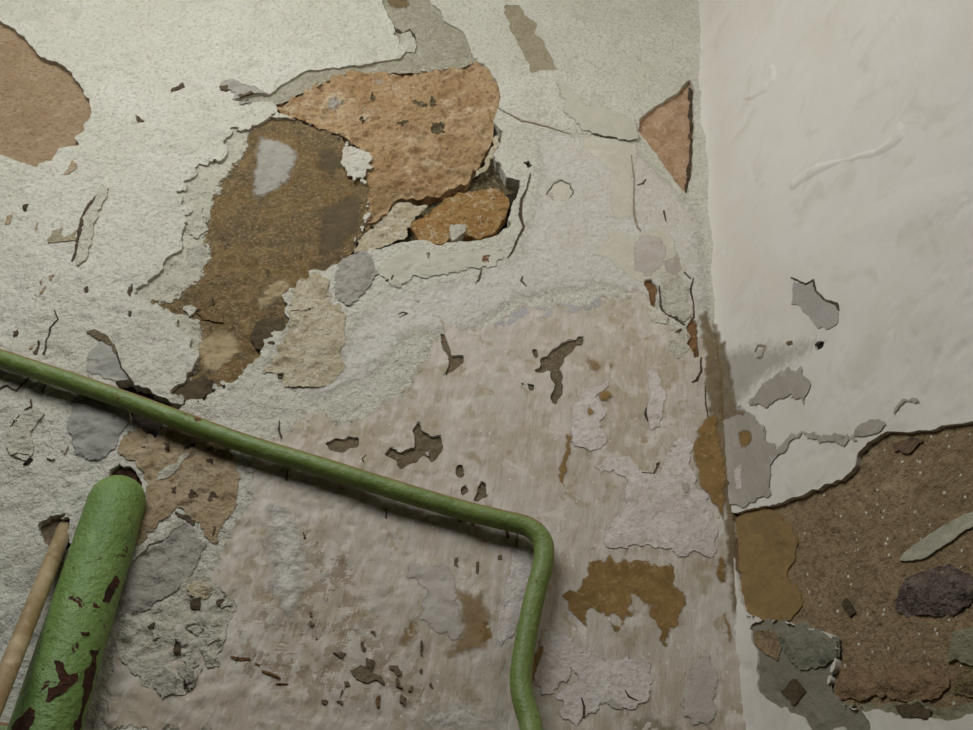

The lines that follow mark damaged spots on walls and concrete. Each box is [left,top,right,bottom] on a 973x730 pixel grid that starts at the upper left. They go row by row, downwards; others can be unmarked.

spalling [0,24,91,167]
crack [497,107,571,135]
spalling [504,6,694,219]
crack [47,184,109,266]
spalling [86,0,518,407]
crack [507,173,531,258]
flaking render [6,407,45,465]
peeling [271,226,973,730]
peeling [46,393,534,730]